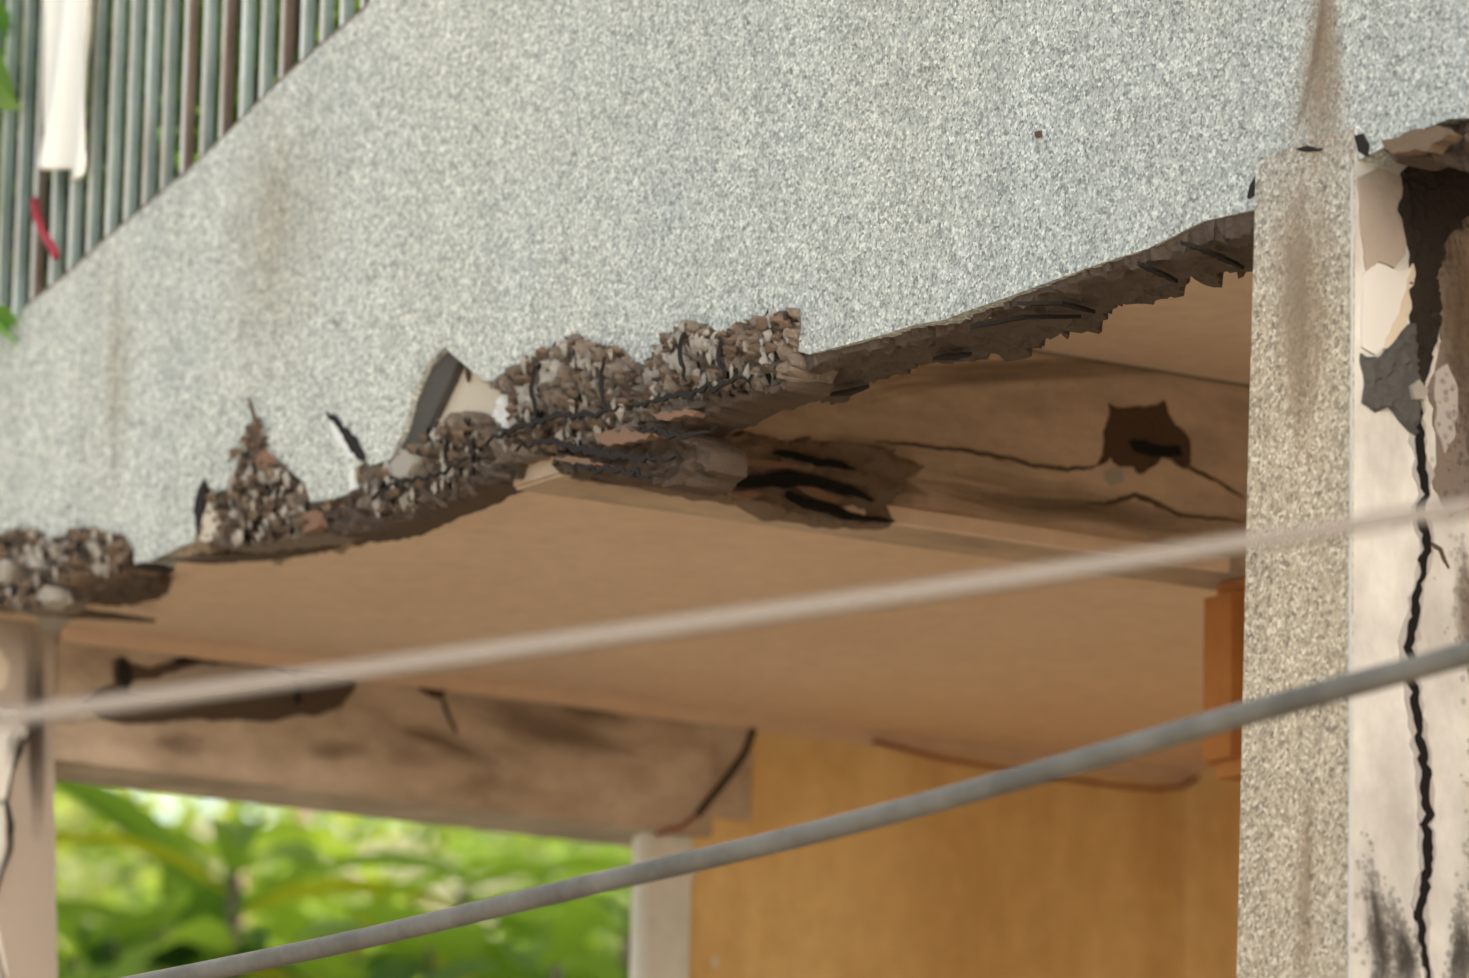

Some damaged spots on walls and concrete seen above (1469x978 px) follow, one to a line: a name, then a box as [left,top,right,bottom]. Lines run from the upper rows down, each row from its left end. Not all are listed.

spalling [177,211,1255,566]
crack [735,441,1247,523]
spalling [1354,120,1469,659]
crack [0,958,8,978]
crack [0,734,31,884]
flaking render [0,527,172,978]
spalling [91,656,356,724]
spalling [417,687,446,700]
spalling [1403,680,1437,978]
crack [1403,401,1450,978]